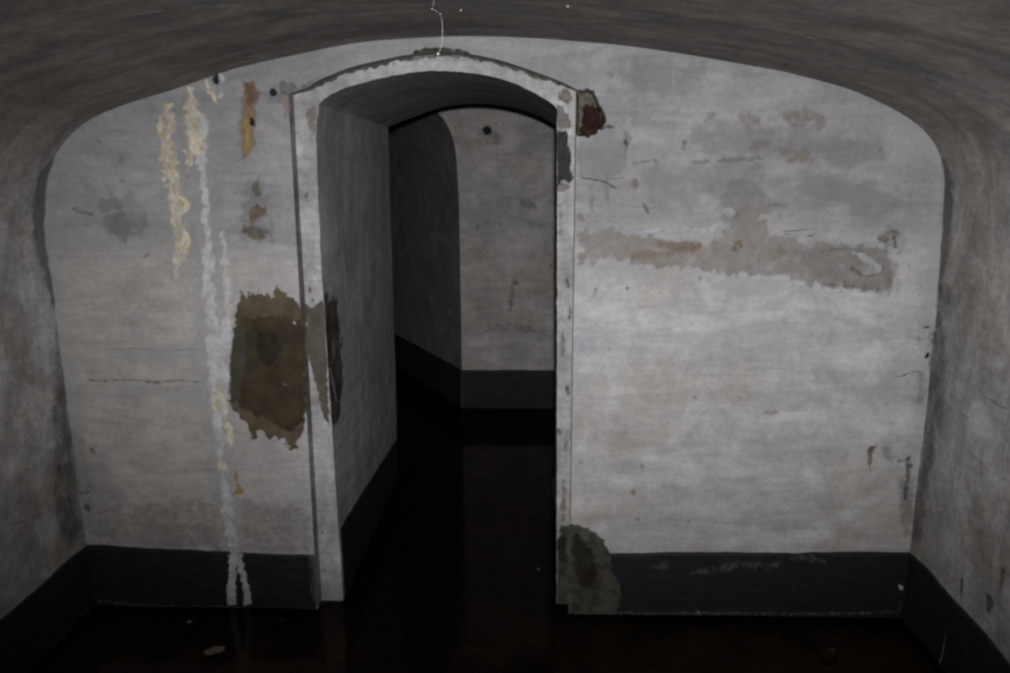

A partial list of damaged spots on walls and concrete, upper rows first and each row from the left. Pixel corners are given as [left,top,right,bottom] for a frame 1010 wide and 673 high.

rust [241,83,258,158]
spalling [557,89,614,191]
peeling [577,203,898,291]
water stain [156,86,343,605]
water stain [557,524,622,619]